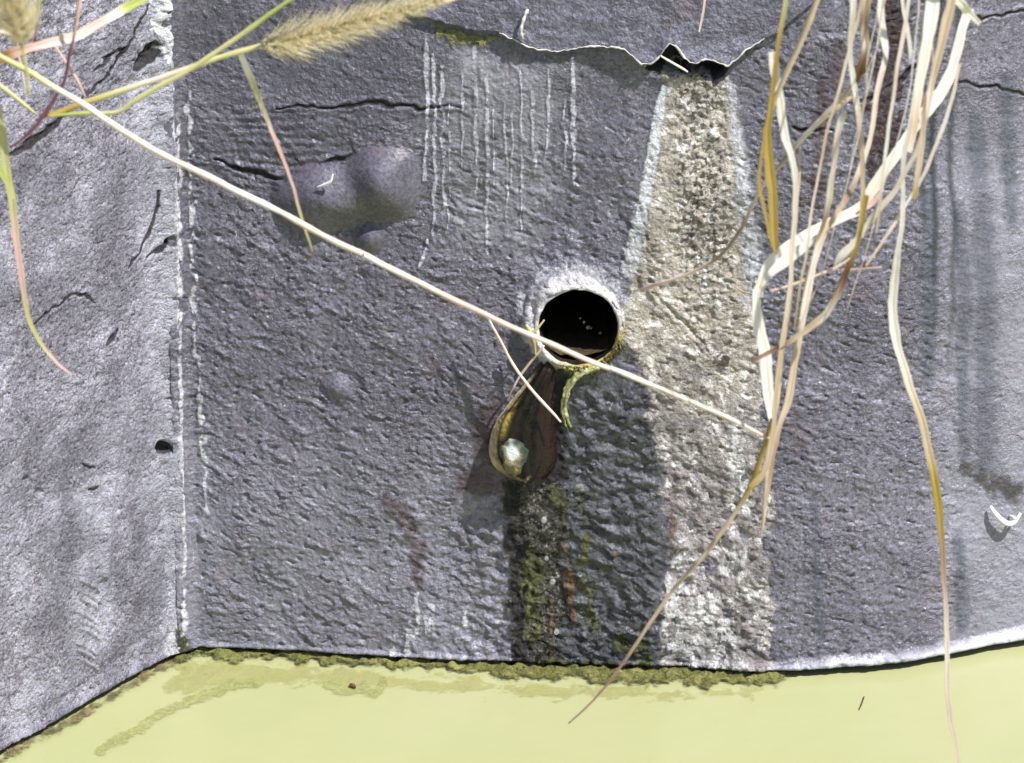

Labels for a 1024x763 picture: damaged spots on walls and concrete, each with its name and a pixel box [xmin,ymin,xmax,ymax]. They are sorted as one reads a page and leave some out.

crack [128,190,167,270]
crack [275,100,461,112]
leakage [418,41,551,268]
leakage [563,57,577,180]
spalling [390,0,814,671]
leakage [500,366,761,672]